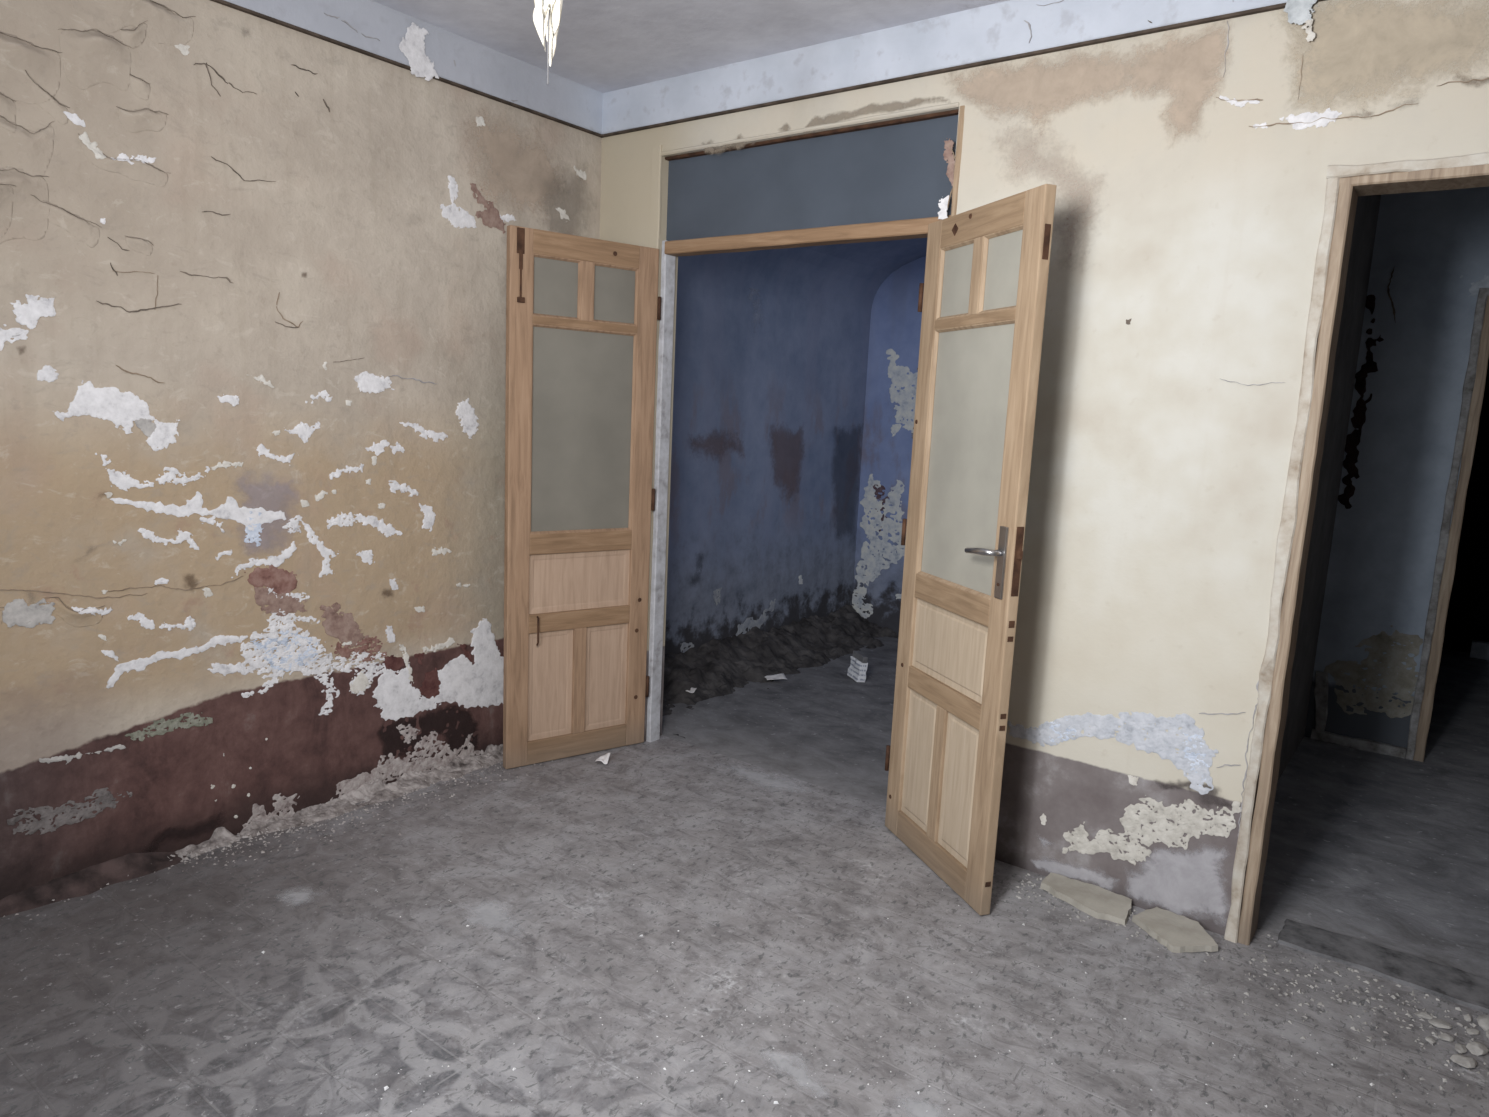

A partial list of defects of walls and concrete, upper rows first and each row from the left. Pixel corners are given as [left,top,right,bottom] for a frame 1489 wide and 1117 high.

crack [194,63,256,96]
crack [292,64,330,112]
leakage [955,29,1228,133]
crack [1216,21,1489,130]
leakage [1294,0,1489,104]
peeling [0,294,56,351]
crack [97,263,233,313]
flaking render [53,380,504,721]
flaking render [852,474,905,619]
leakage [207,622,386,715]
leakage [377,706,484,772]
peeling [1007,711,1242,865]